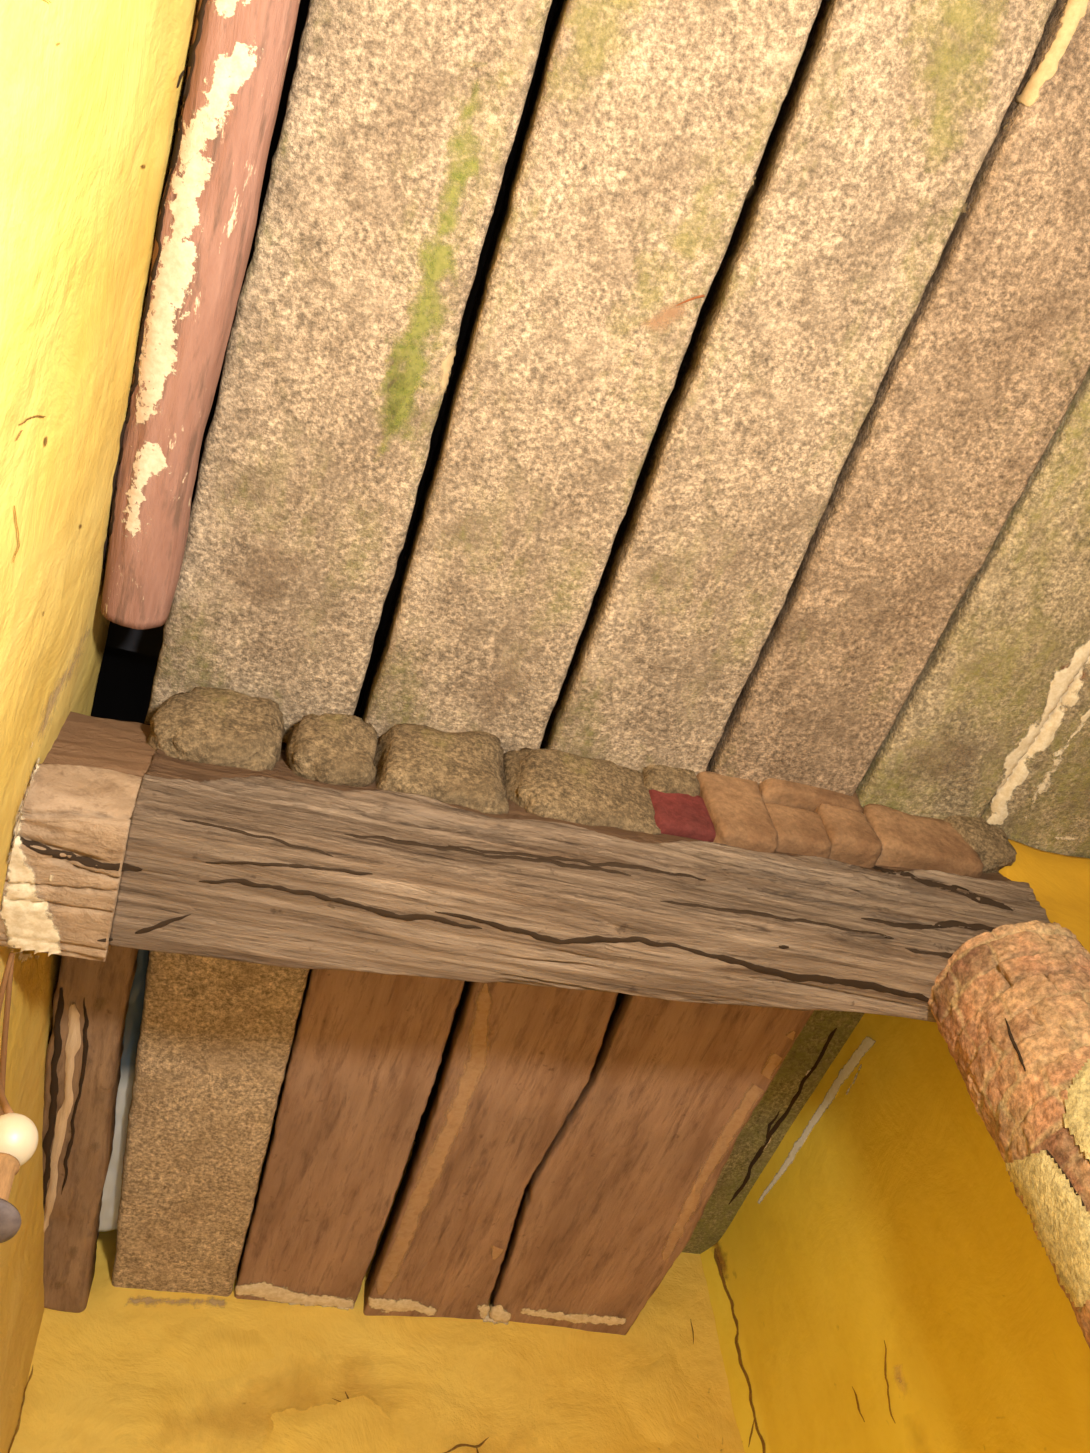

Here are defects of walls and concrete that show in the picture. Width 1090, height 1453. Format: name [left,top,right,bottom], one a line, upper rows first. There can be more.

peeling [212,0,251,19]
peeling [135,41,263,426]
peeling [122,442,170,552]
crack [13,835,142,872]
crack [97,819,1013,1002]
crack [714,1248,765,1453]